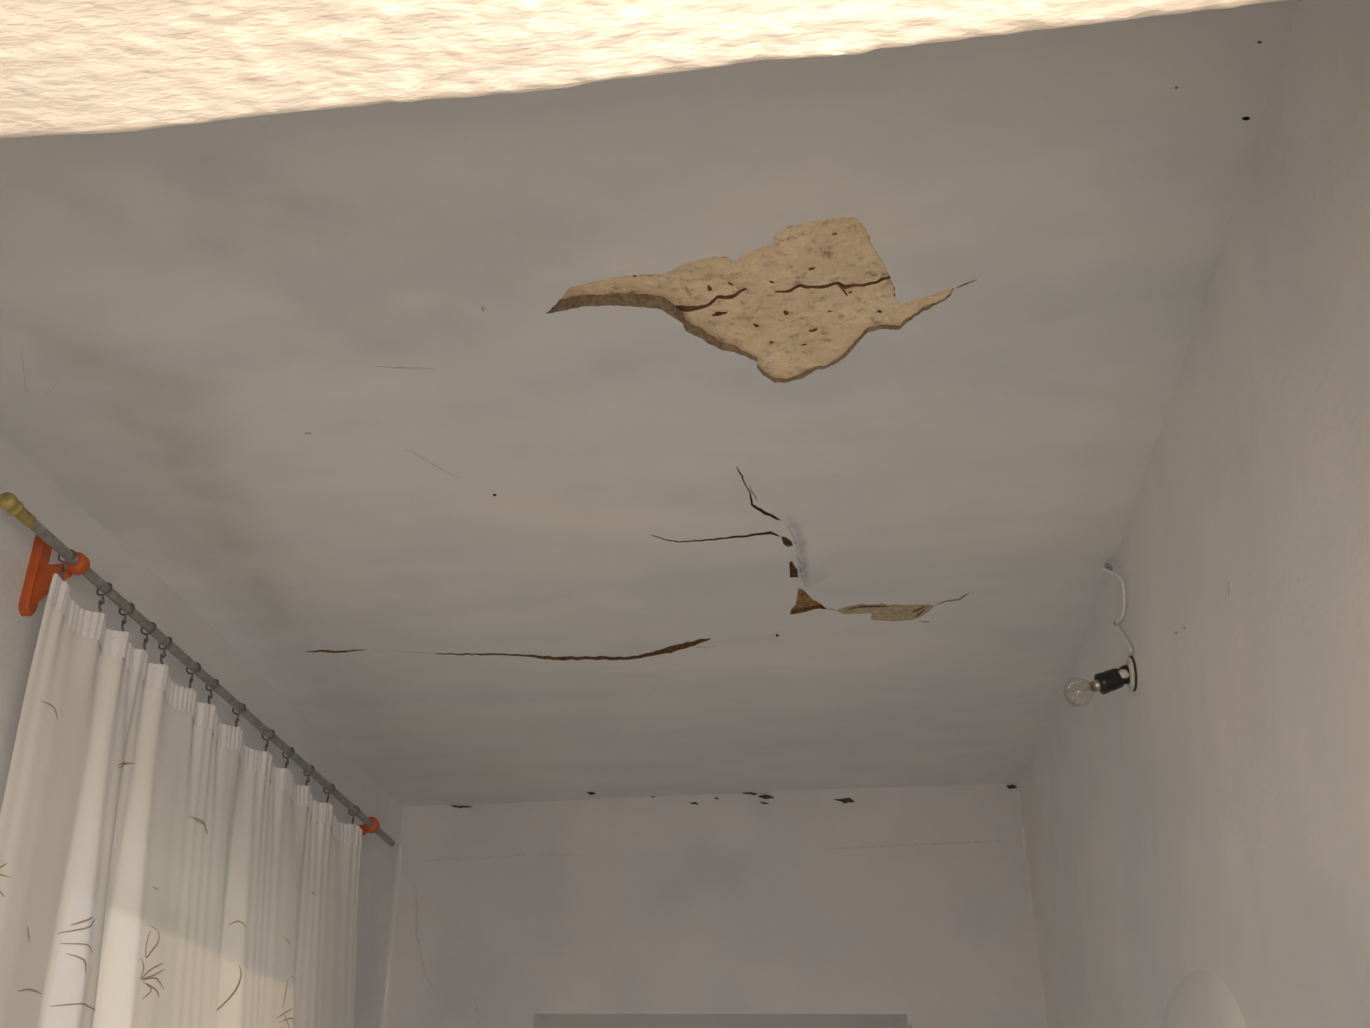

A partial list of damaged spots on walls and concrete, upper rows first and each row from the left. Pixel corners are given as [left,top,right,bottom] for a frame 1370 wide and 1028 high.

spalling [546,217,976,383]
crack [652,466,798,578]
crack [305,638,717,660]
peeling [790,588,970,623]